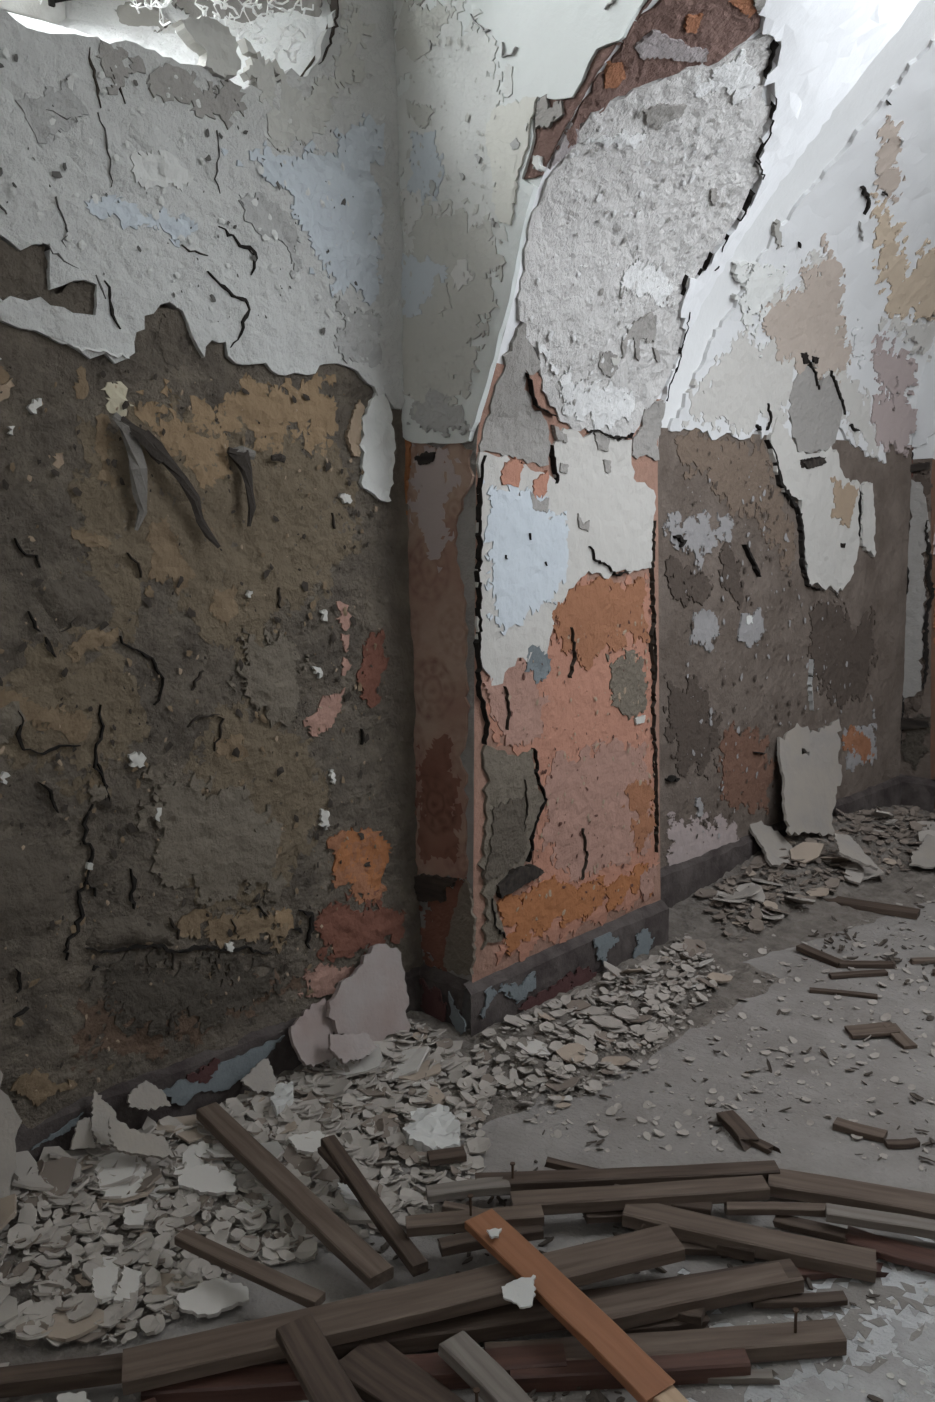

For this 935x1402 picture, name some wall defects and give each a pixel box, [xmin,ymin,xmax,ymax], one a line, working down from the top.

flaking render [96,1,248,130]
flaking render [0,239,130,359]
peeling [0,378,15,402]